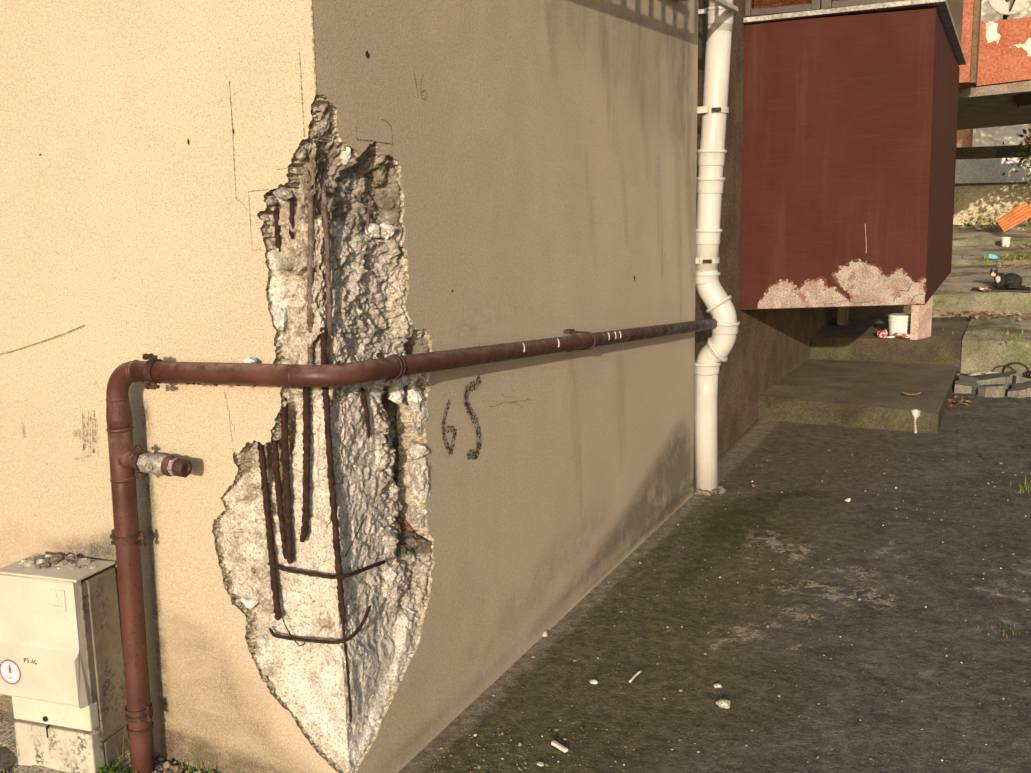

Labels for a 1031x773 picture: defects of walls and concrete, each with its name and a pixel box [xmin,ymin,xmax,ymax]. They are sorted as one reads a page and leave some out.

peeling [986,21,1031,56]
spalling [257,94,432,365]
peeling [757,258,927,309]
spalling [212,372,435,773]